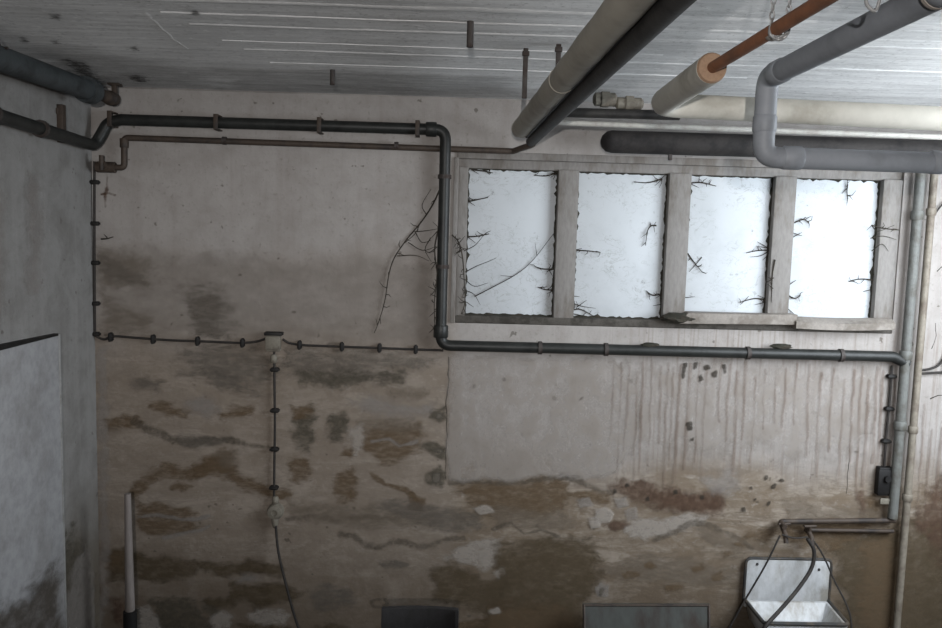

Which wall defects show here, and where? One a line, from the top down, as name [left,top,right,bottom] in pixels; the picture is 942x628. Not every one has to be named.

leakage [682,363,726,382]
leakage [289,407,316,481]
leakage [328,415,421,462]
leakage [130,437,292,535]
leakage [374,475,568,529]
flaking render [574,492,629,531]
leakage [106,550,299,628]
leakage [431,537,604,628]
leakage [728,486,942,628]